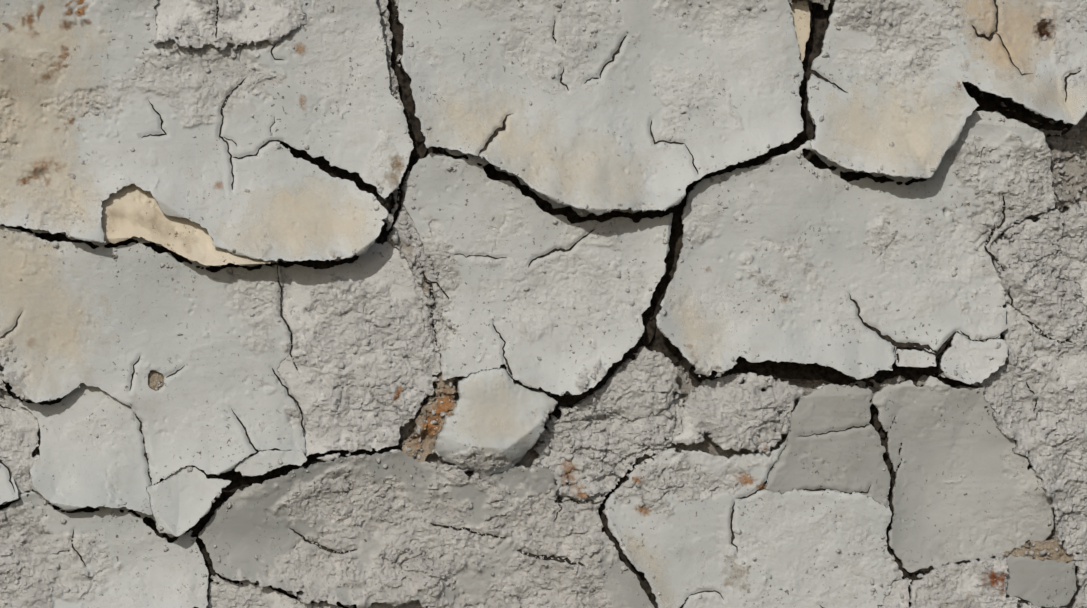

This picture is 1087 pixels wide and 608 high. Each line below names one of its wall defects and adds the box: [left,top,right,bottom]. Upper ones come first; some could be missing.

crack [142,101,166,138]
crack [213,0,221,37]
crack [972,0,1032,75]
crack [963,70,1081,138]
peeling [0,0,414,608]
peeling [198,0,810,608]
crack [219,0,999,608]
peeling [532,0,1087,608]
crack [984,196,1071,343]
crack [0,224,400,608]
corrosion [413,396,454,439]